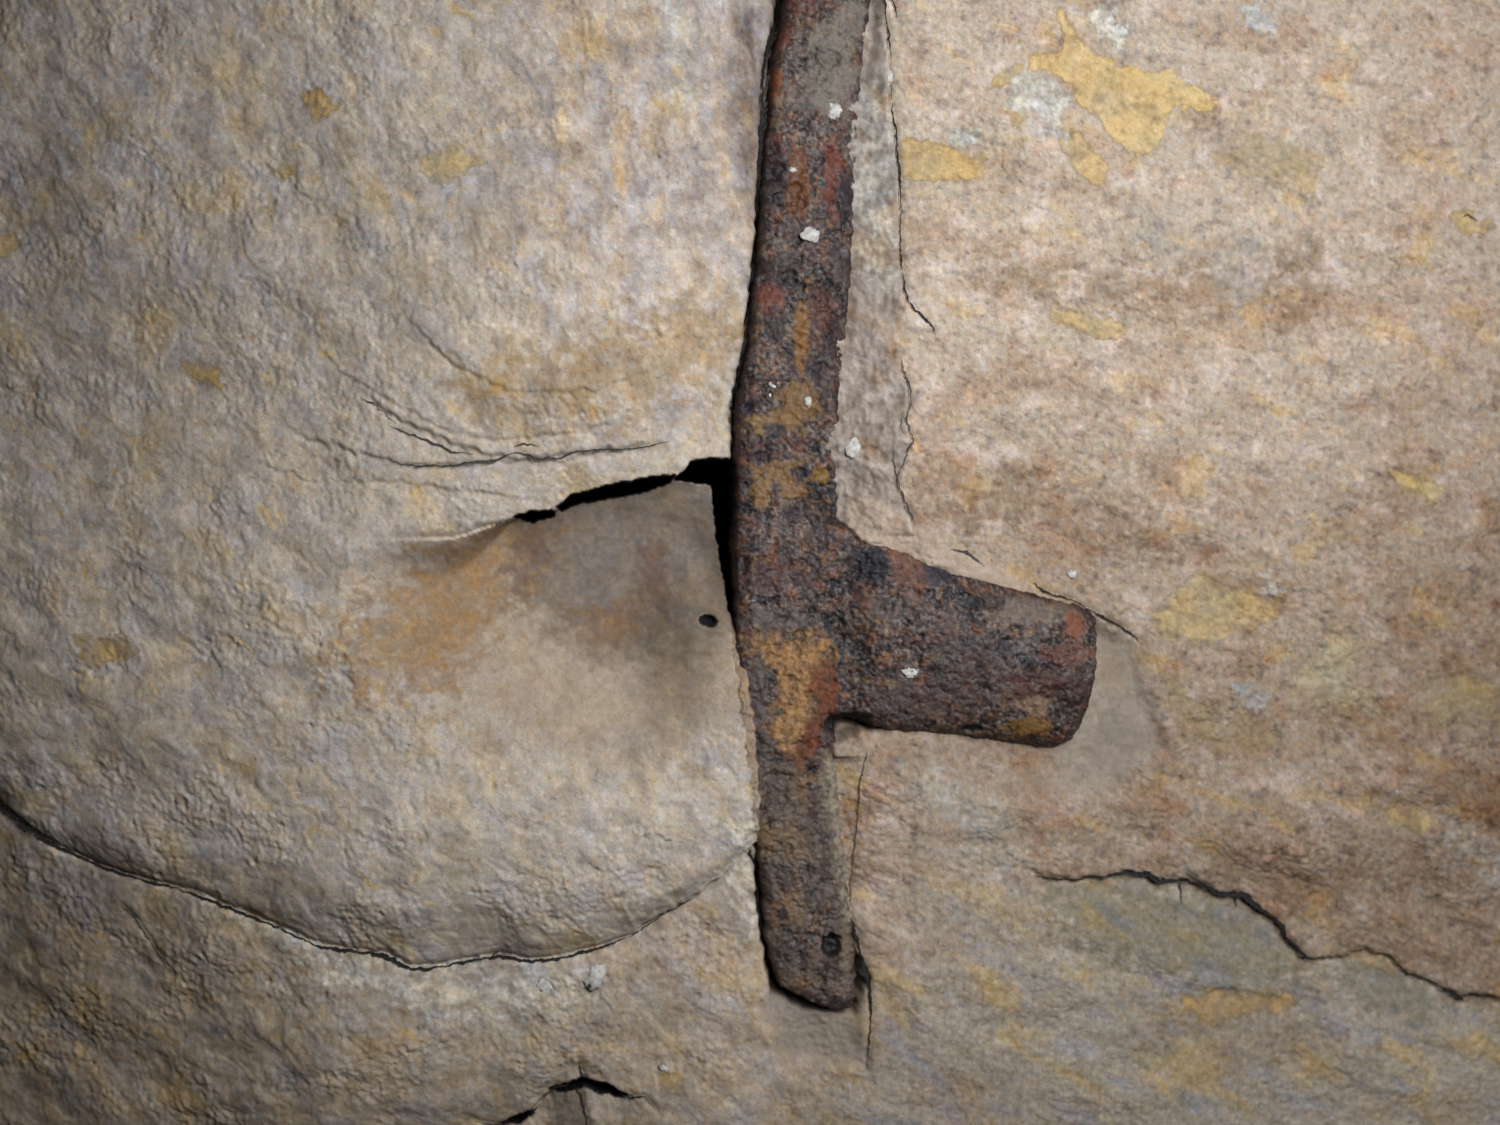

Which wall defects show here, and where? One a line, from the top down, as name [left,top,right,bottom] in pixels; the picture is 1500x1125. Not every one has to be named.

crack [362,397,670,468]
corrosion [739,629,840,768]
crack [0,804,693,975]
crack [1036,869,1314,960]
crack [1369,949,1500,1002]
crack [479,1061,587,1125]
crack [618,1090,656,1110]